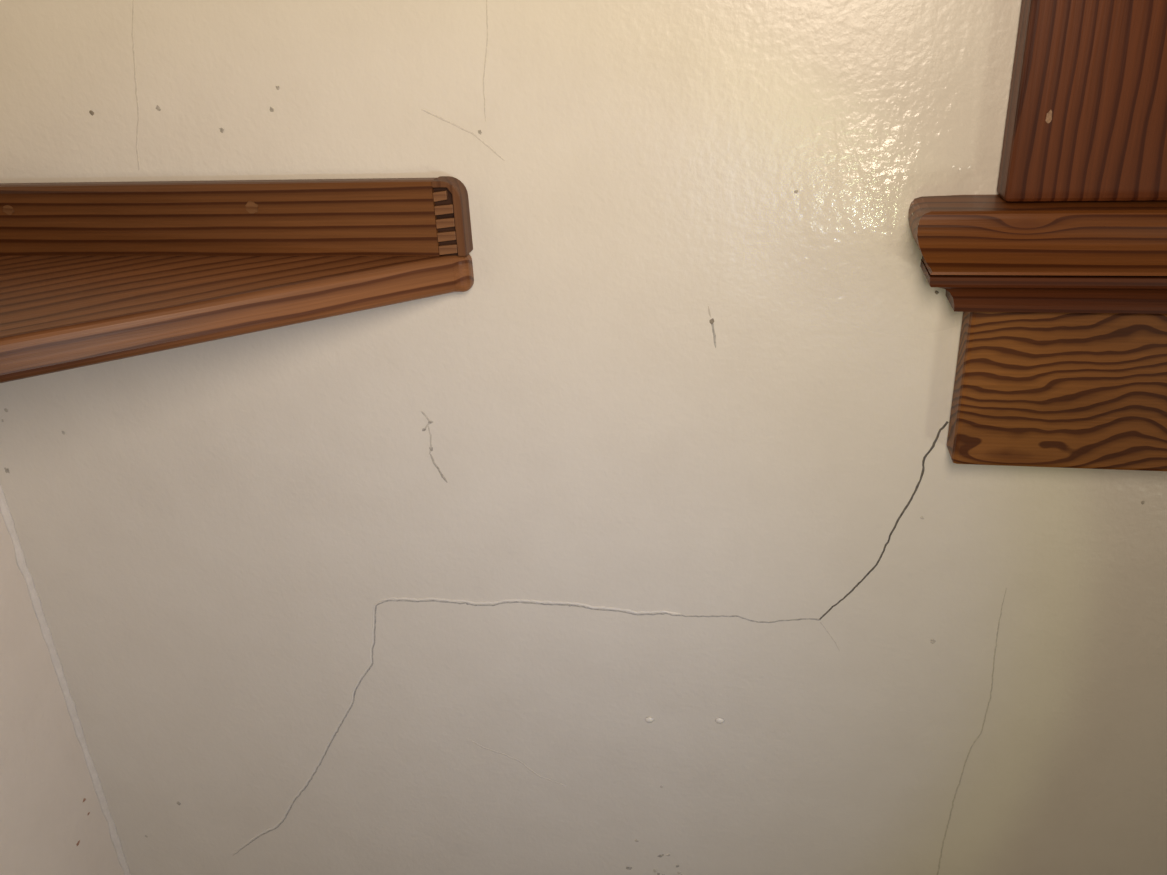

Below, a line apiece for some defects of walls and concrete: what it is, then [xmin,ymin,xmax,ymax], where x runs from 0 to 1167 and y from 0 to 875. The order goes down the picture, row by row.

crack [231,411,949,855]